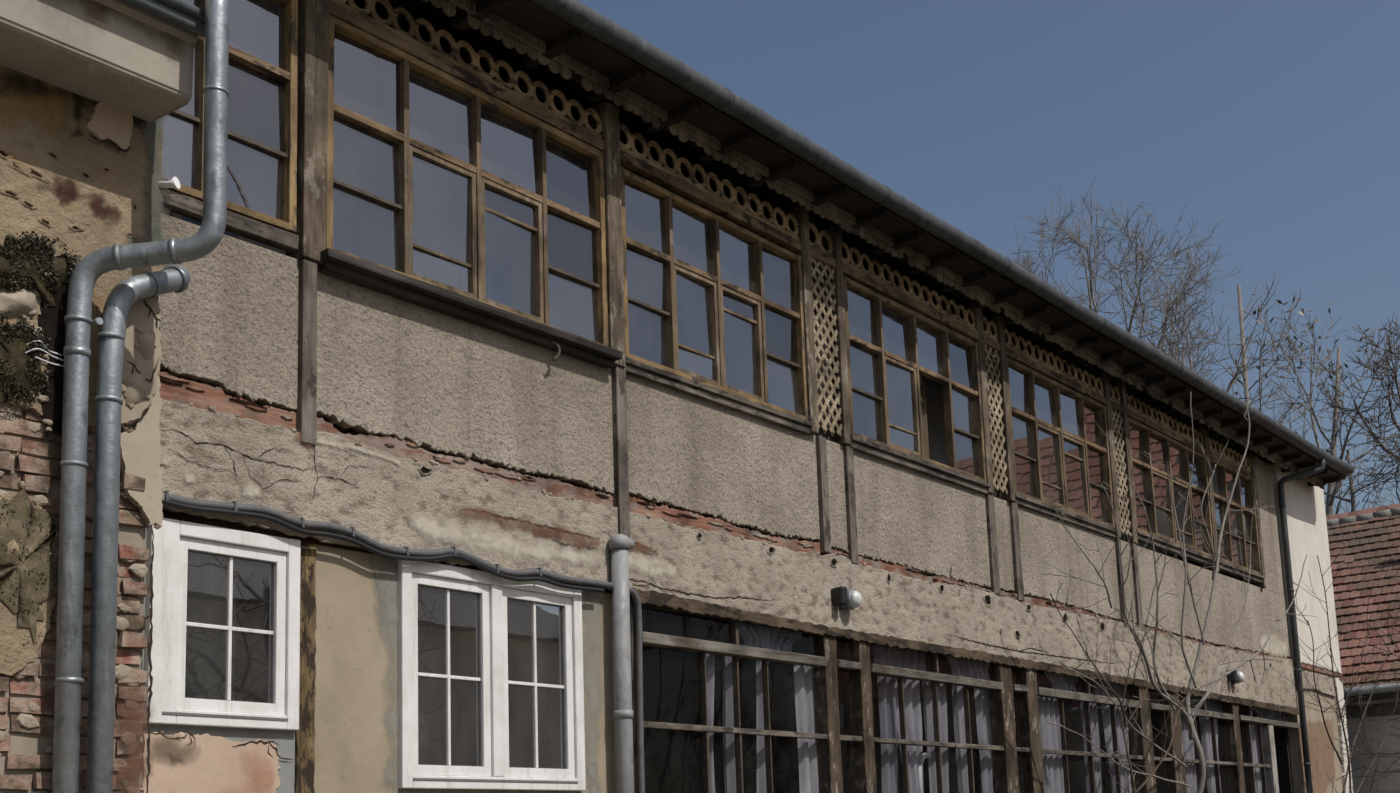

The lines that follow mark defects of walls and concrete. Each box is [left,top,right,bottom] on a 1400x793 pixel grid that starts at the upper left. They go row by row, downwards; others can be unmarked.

peeling [85,102,133,153]
spalling [0,187,85,232]
flaking render [0,283,69,548]
flaking render [82,504,93,654]
peeling [119,297,297,529]
crack [160,429,374,498]
crack [467,509,600,549]
crack [629,542,774,601]
spalling [317,412,1342,677]
flaking render [0,566,58,793]
flaking render [79,683,89,790]
peeling [113,543,280,793]